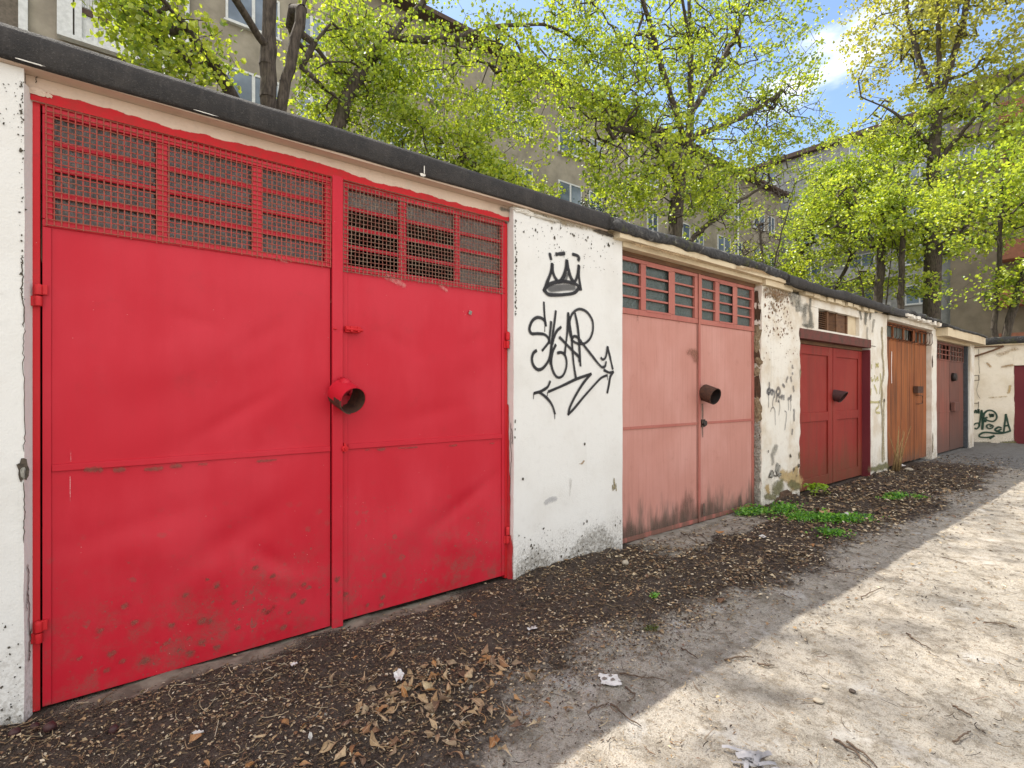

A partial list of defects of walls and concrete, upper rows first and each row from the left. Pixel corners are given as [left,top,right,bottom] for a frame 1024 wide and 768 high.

spalling [754,291,781,507]